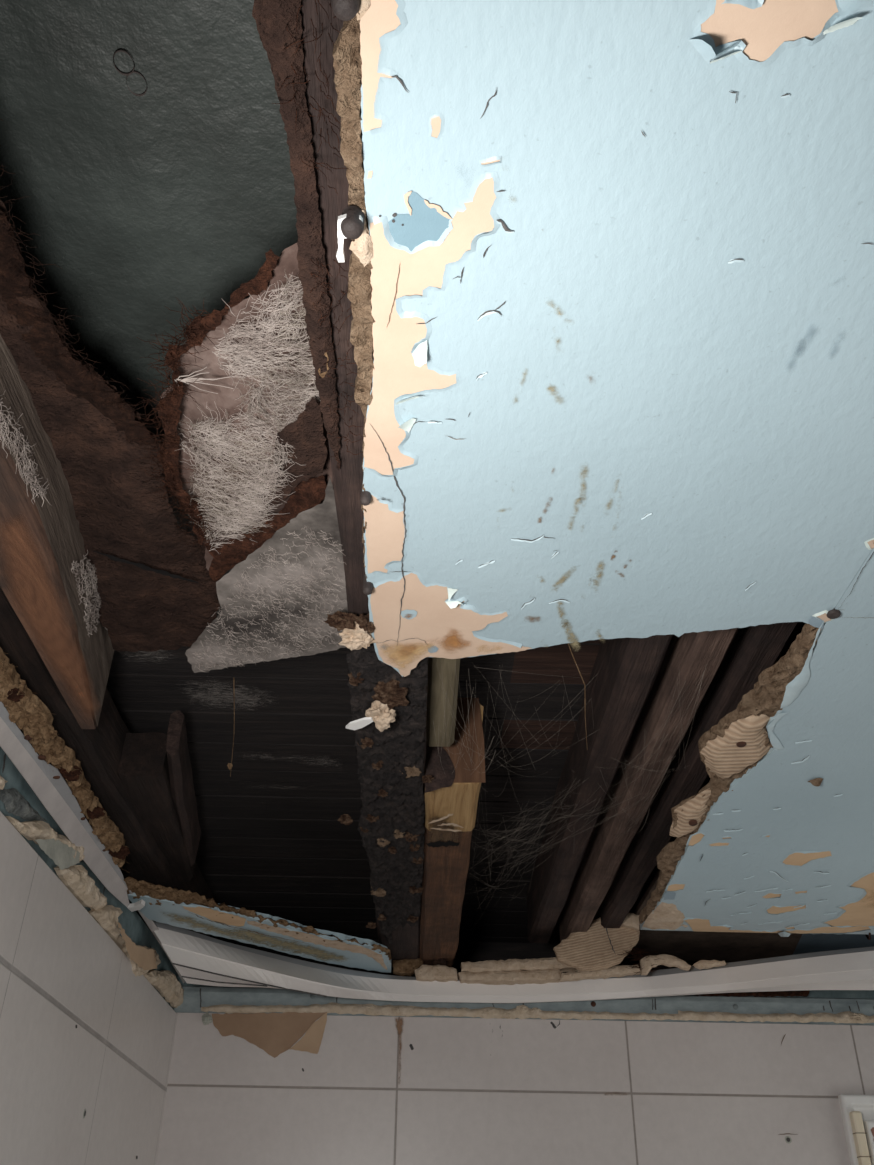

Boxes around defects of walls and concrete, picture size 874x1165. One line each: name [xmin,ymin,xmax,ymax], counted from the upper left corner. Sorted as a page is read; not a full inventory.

peeling [688,0,863,69]
peeling [332,0,532,677]
crack [370,424,429,646]
spalling [639,610,834,924]
peeling [684,871,874,940]